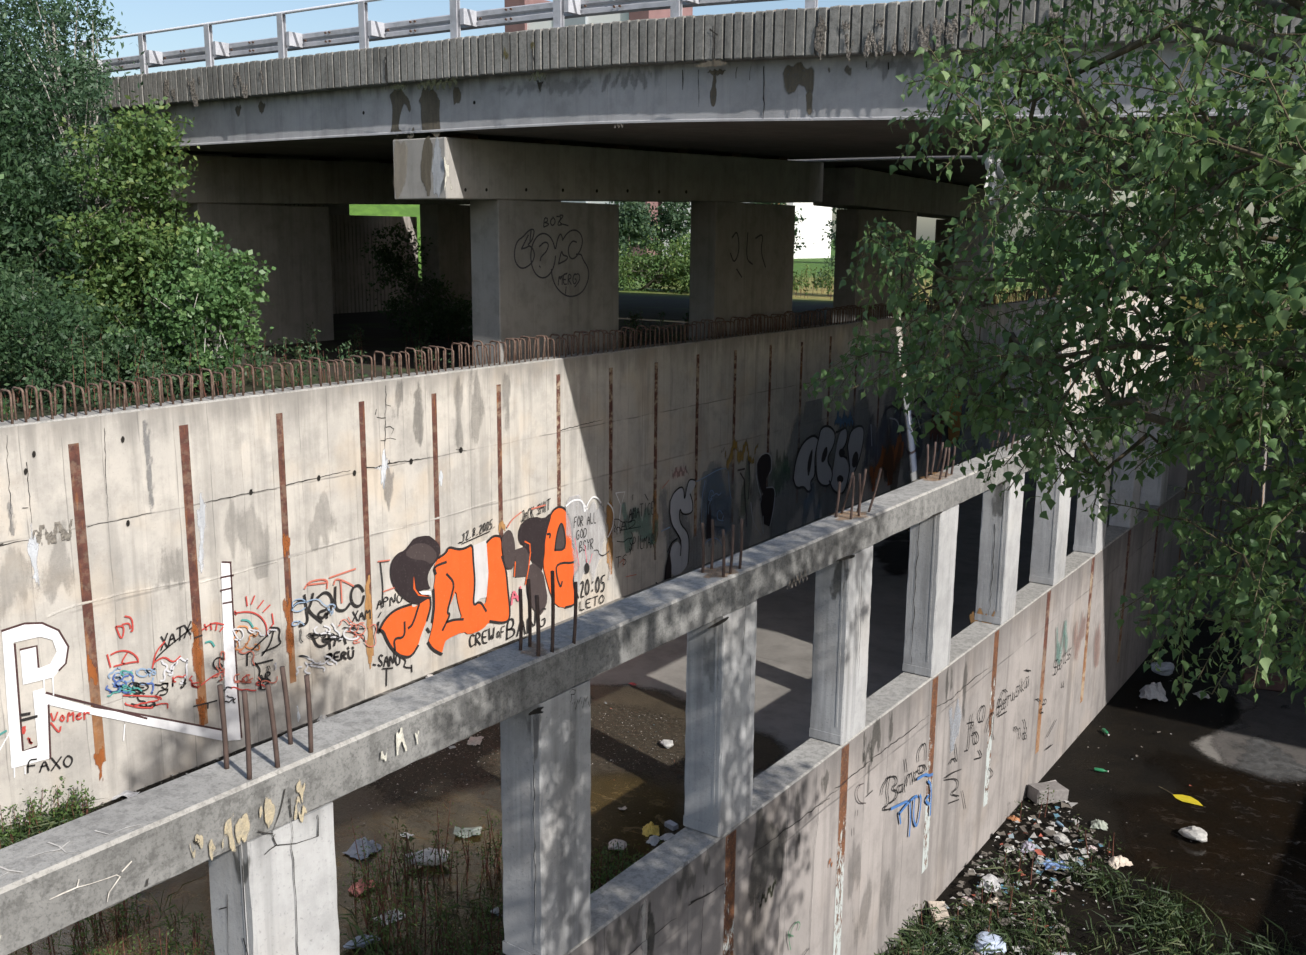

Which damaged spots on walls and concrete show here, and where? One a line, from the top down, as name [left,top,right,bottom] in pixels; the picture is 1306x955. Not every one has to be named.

water stain [783,62,851,115]
water stain [390,84,475,197]
corrosion [282,533,290,557]
corrosion [283,597,294,662]
corrosion [365,574,373,669]
corrosion [87,655,98,685]
corrosion [190,618,206,725]
corrosion [94,746,104,780]
peeling [190,797,275,860]
peeling [294,781,307,822]